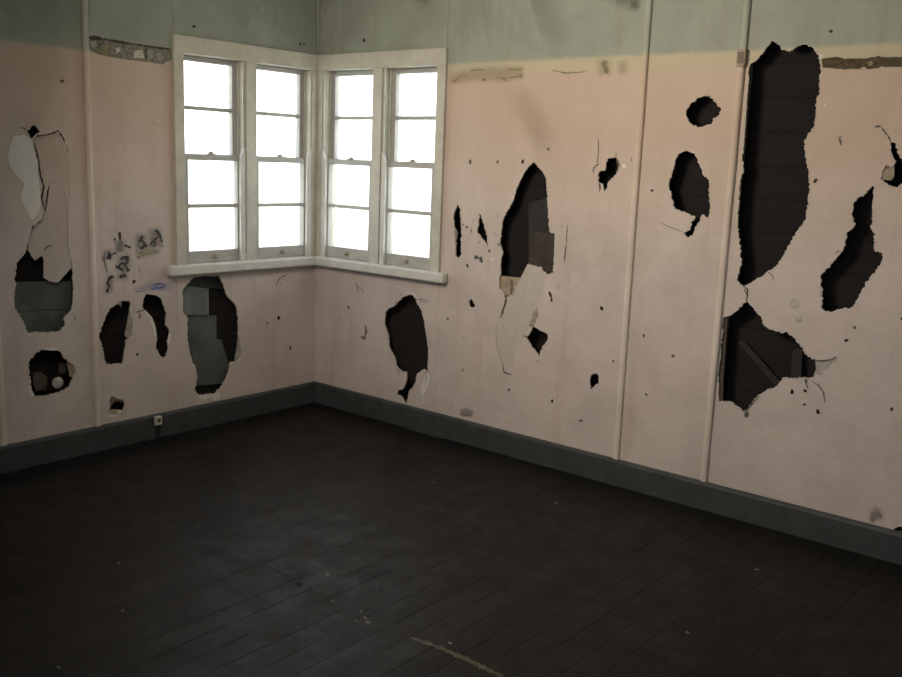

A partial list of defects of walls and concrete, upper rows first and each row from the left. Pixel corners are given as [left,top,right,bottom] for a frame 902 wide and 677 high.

peeling [89,36,171,64]
spalling [685,95,721,127]
spalling [8,125,76,335]
spalling [453,206,489,258]
spalling [496,162,556,375]
spalling [593,142,632,192]
spalling [662,151,710,237]
spalling [717,40,902,418]
spalling [28,347,76,396]
spalling [99,293,172,365]
spalling [182,275,242,401]
spalling [384,291,430,406]